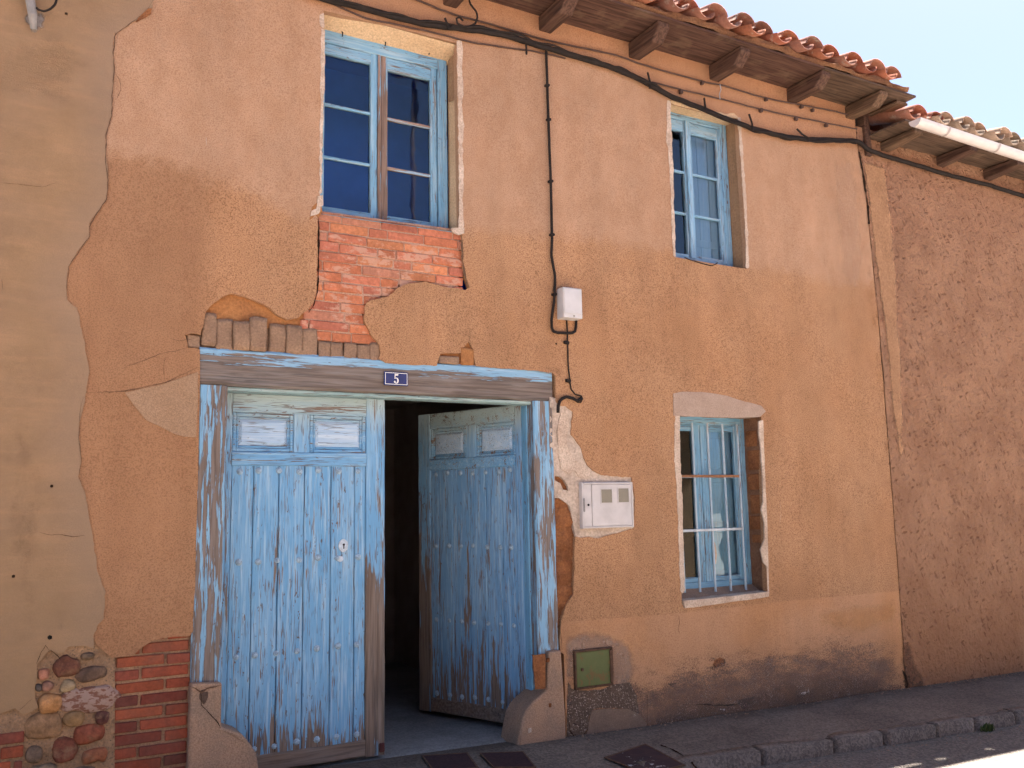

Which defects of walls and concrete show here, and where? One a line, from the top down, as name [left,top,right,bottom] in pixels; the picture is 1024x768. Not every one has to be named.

flaking render [206,13,468,345]
crack [78,339,191,487]
flaking render [549,397,635,629]
flaking render [115,635,208,768]
leakage [568,635,899,726]